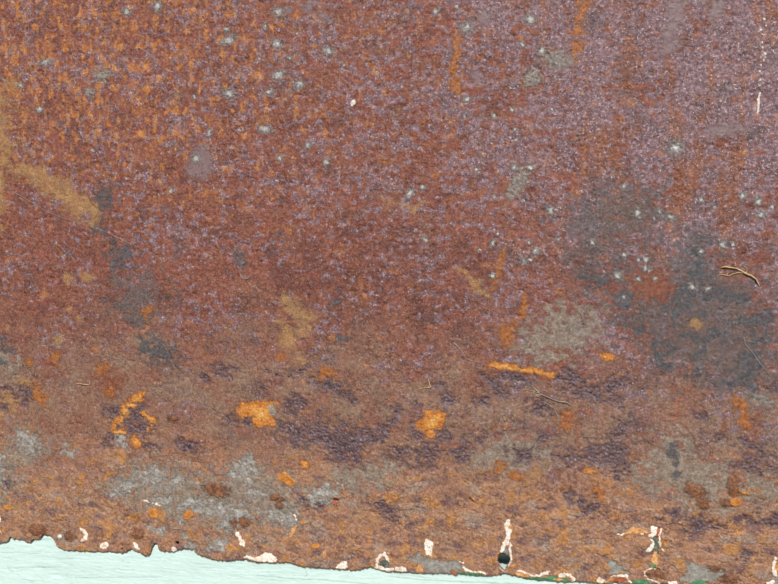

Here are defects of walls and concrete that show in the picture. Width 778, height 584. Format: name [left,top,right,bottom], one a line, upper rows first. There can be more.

corrosion [570,0,592,37]
corrosion [447,36,464,93]
corrosion [492,246,507,285]
corrosion [631,270,676,303]
corrosion [484,360,559,382]
corrosion [111,391,150,438]
corrosion [29,524,47,536]
spalling [365,500,407,525]
peeling [374,539,486,576]
peeling [500,519,513,561]
peeling [515,570,576,582]
peeling [596,507,778,584]